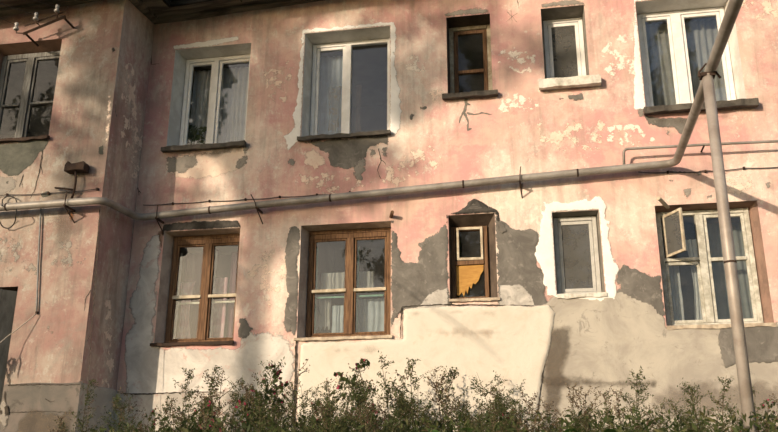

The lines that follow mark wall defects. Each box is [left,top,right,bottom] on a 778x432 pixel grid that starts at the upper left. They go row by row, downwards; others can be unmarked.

peeling [742,0,778,21]
peeling [498,47,536,74]
peeling [601,35,639,82]
crack [459,99,492,131]
peeling [496,93,539,113]
peeling [0,140,48,195]
crack [19,151,43,198]
peeling [165,144,250,179]
peeling [288,135,441,194]
spalling [446,199,506,233]
peeling [238,318,253,338]
peeling [283,303,291,331]